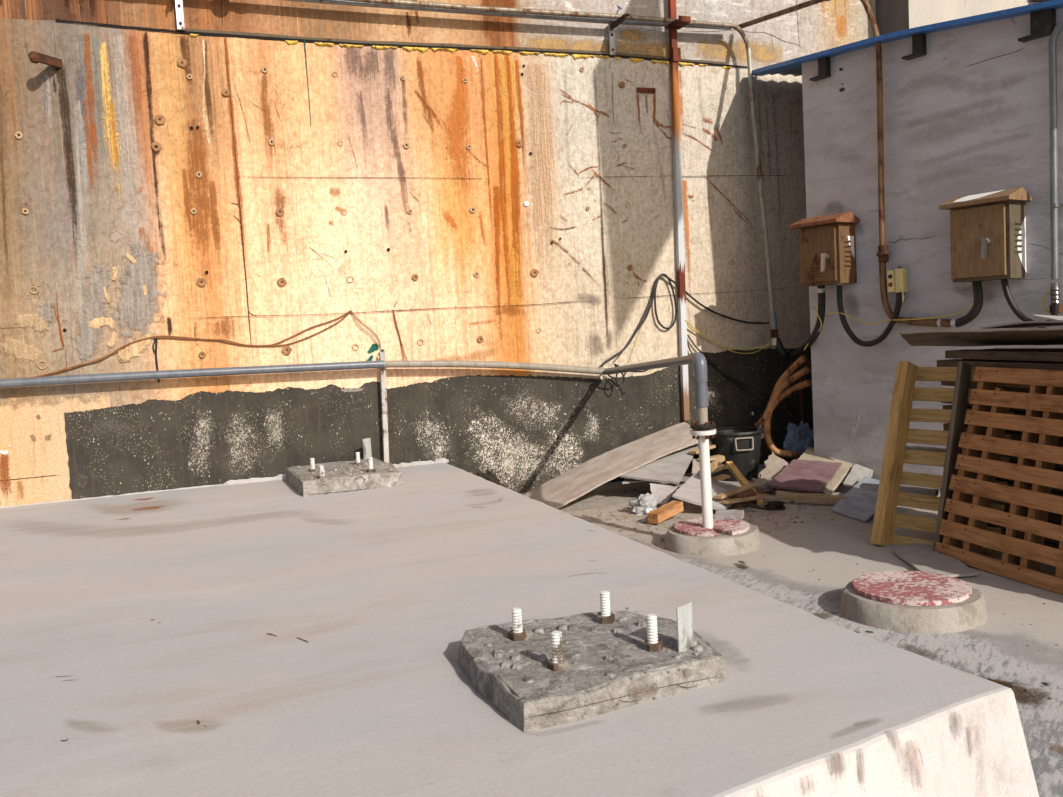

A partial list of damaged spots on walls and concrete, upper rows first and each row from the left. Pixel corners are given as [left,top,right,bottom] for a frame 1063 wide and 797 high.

rust [183,118,220,253]
rust [224,36,245,244]
rust [387,56,470,200]
rust [476,54,524,331]
rust [682,180,690,284]